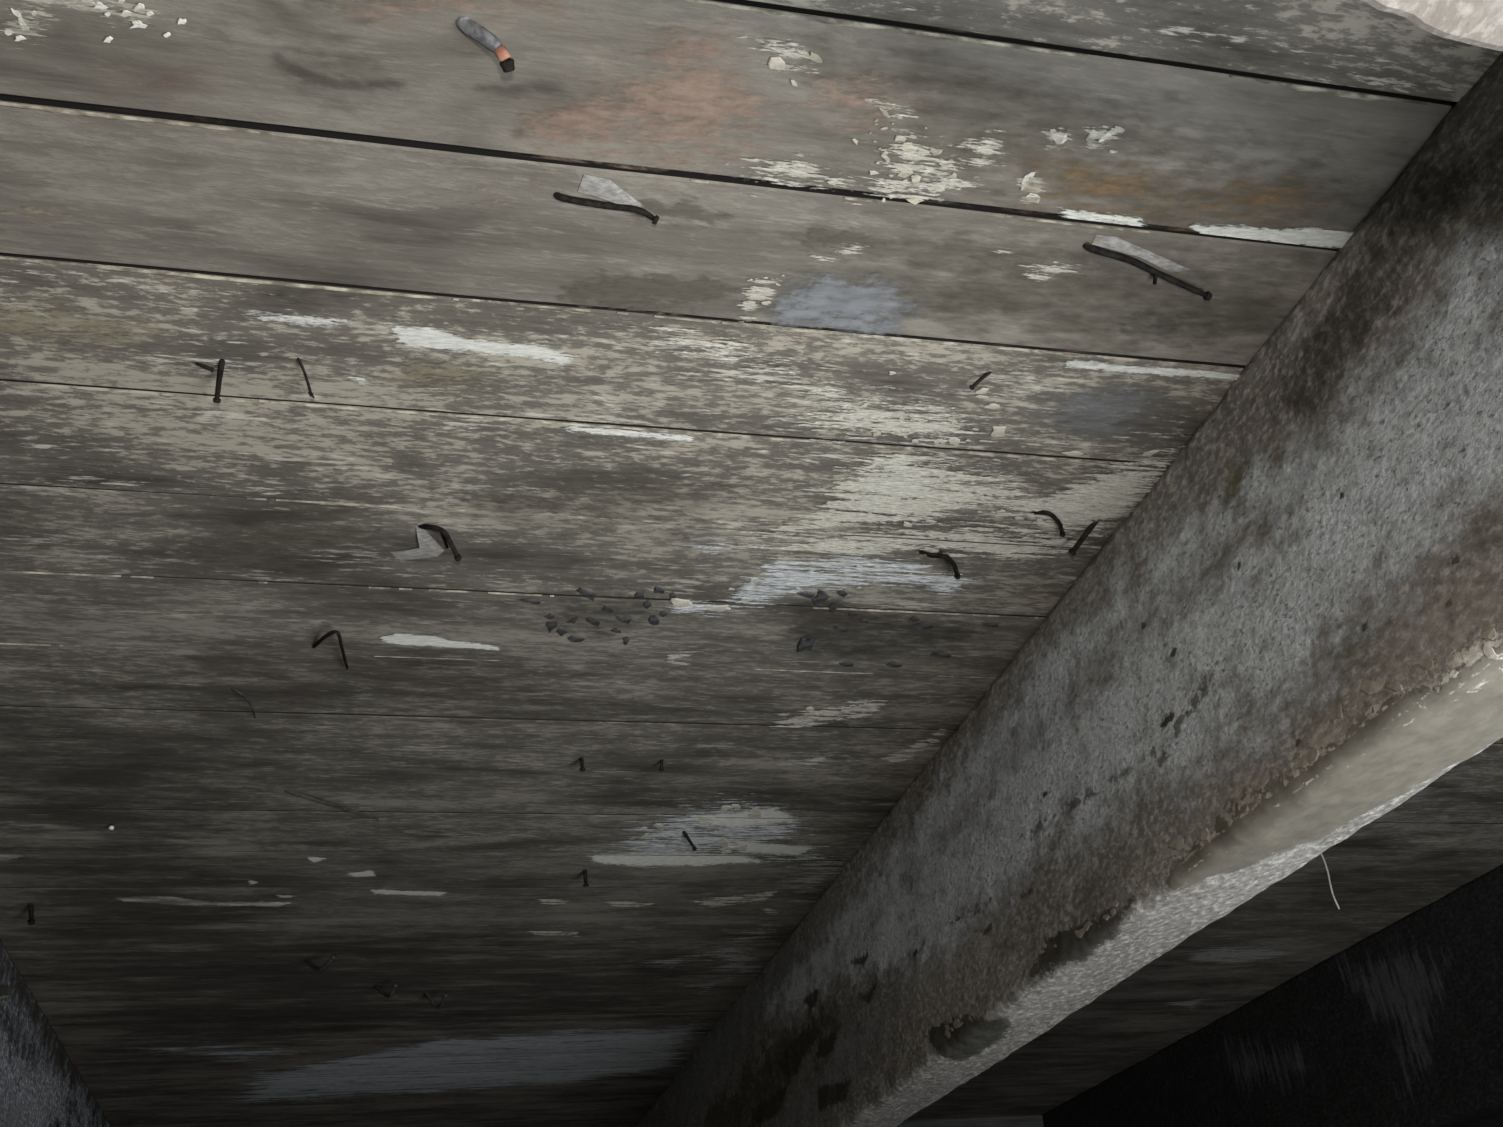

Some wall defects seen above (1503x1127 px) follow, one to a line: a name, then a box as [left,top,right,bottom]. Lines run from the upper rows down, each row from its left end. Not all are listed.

peeling [0,0,154,41]
peeling [737,37,822,86]
peeling [739,98,1005,205]
peeling [1049,129,1067,144]
peeling [1085,126,1125,153]
peeling [1020,172,1040,203]
leakage [629,198,733,222]
leakage [559,274,740,314]
leakage [764,230,1503,1030]